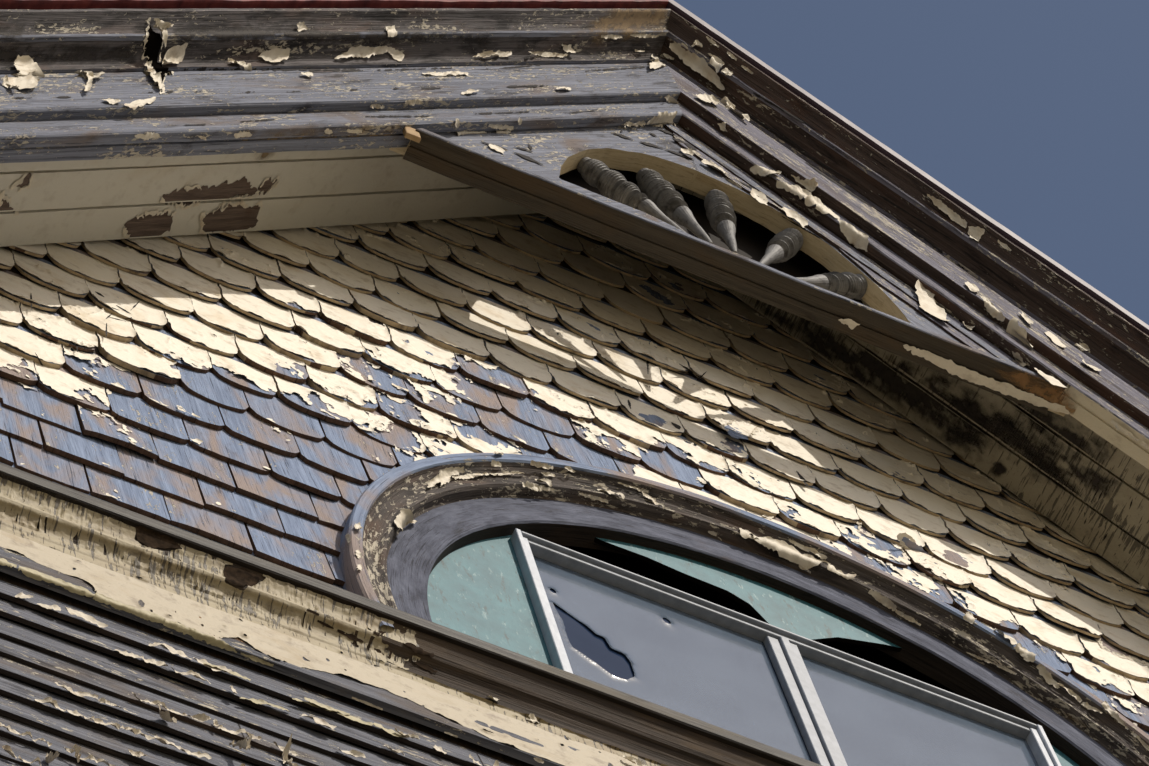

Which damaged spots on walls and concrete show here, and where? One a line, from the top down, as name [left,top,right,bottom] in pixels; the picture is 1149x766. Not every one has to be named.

peeling [2,55,45,89]
peeling [102,18,188,110]
peeling [228,48,290,71]
crack [141,17,452,117]
peeling [334,25,404,61]
peeling [422,71,479,95]
crack [475,65,548,114]
crack [585,65,650,73]
peeling [601,34,753,132]
crack [481,141,543,165]
peeling [681,148,869,252]
peeling [0,171,1149,766]